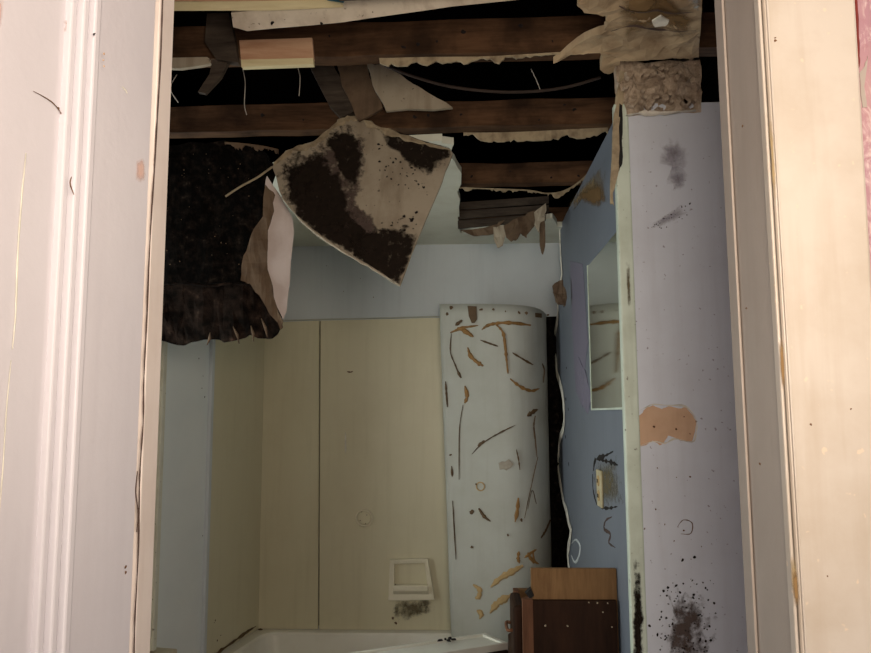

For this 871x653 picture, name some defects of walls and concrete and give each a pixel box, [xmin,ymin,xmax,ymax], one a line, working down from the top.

peeling [652,15,669,27]
spalling [613,56,702,117]
water stain [377,131,450,189]
water stain [282,126,418,283]
peeling [639,404,698,446]
water stain [633,566,717,653]